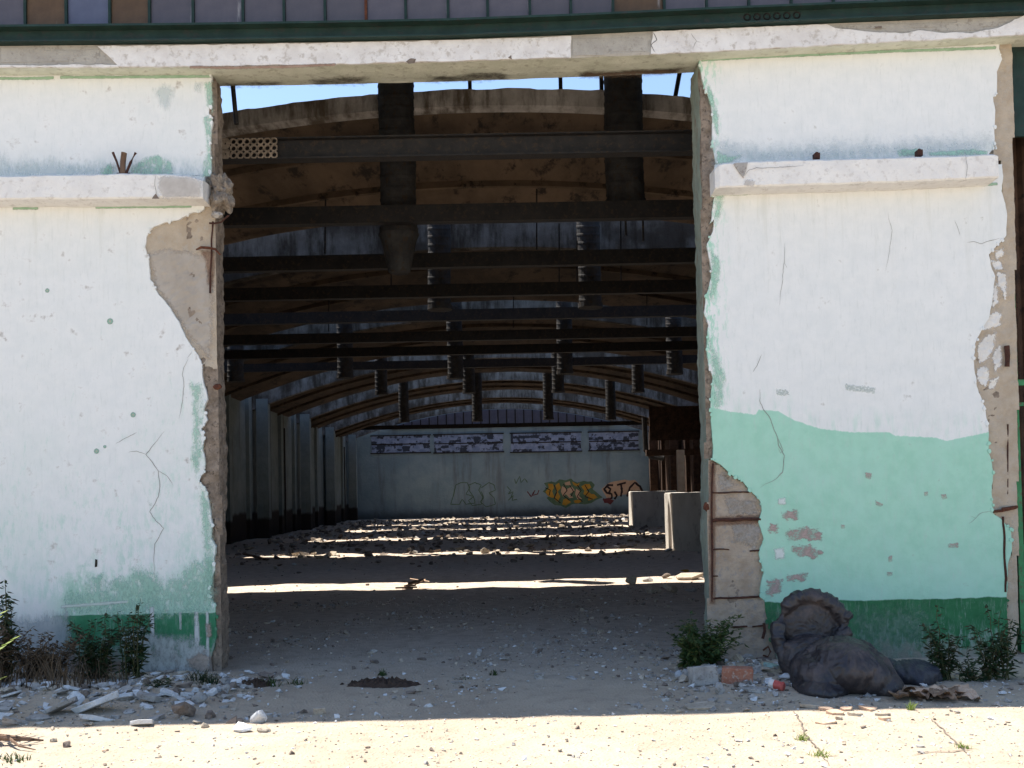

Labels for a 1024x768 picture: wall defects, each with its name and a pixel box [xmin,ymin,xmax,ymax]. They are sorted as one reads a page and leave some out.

spalling [64,194,230,672]
crack [117,356,189,581]
crack [759,400,785,485]
spalling [698,44,1019,659]